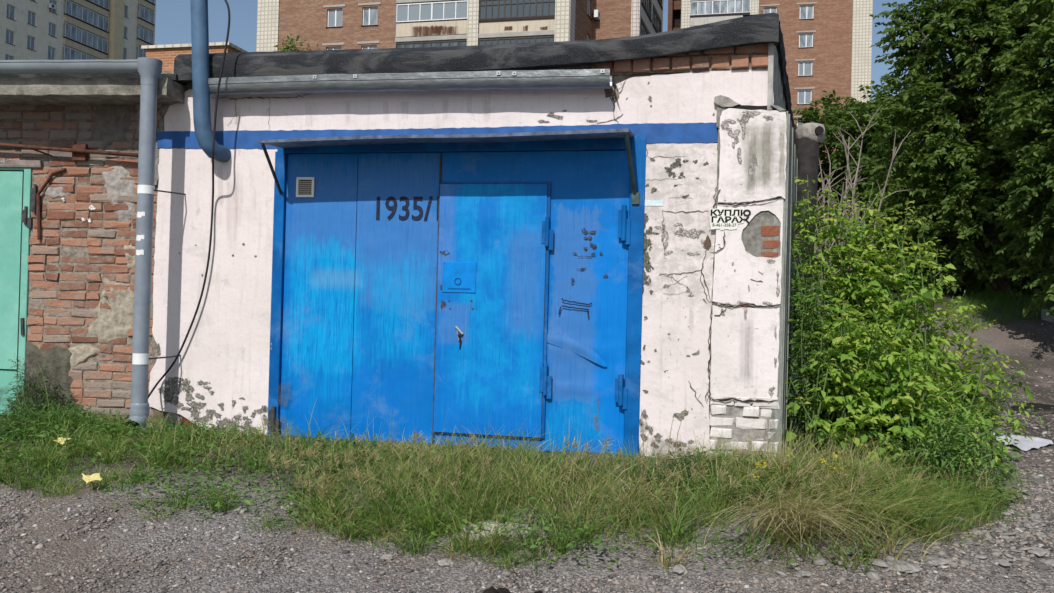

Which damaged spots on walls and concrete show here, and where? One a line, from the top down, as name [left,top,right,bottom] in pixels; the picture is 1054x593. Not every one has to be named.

peeling [89,104,140,151]
peeling [44,186,72,201]
peeling [102,164,137,222]
peeling [650,158,709,198]
damp [748,133,768,184]
peeling [571,228,603,284]
peeling [642,213,714,294]
crack [645,148,782,407]
peeling [153,377,269,435]